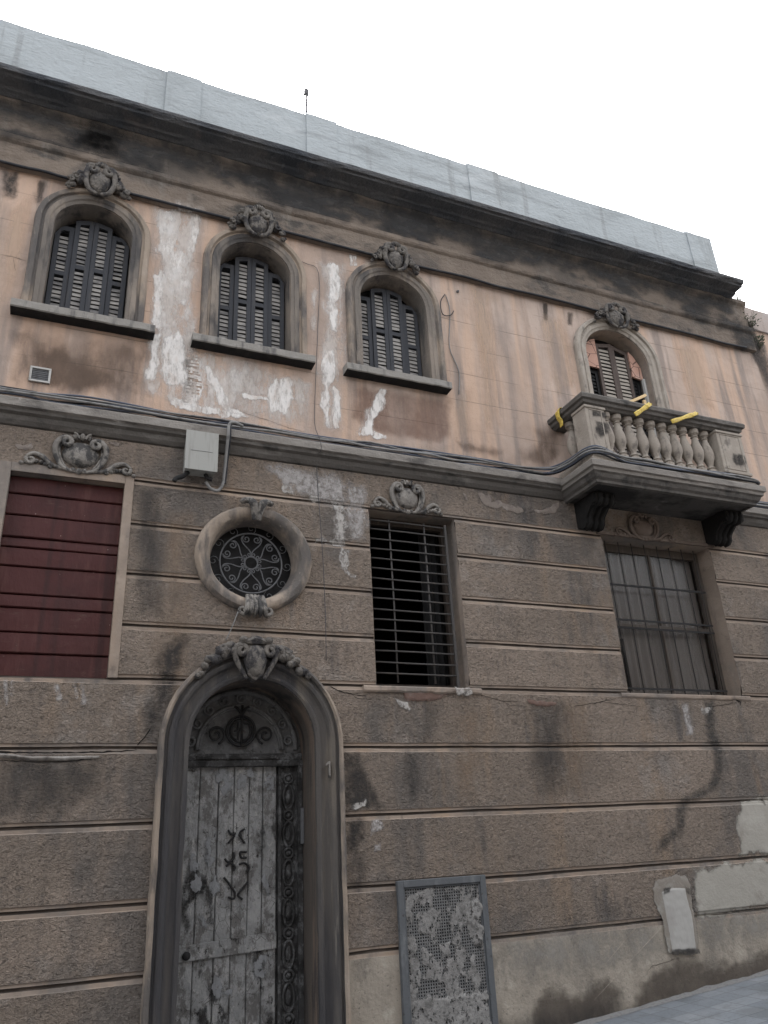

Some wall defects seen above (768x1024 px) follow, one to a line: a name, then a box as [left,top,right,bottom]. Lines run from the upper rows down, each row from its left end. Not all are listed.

water stain [4,173,17,194]
peeling [168,355,308,421]
peeling [358,389,386,439]